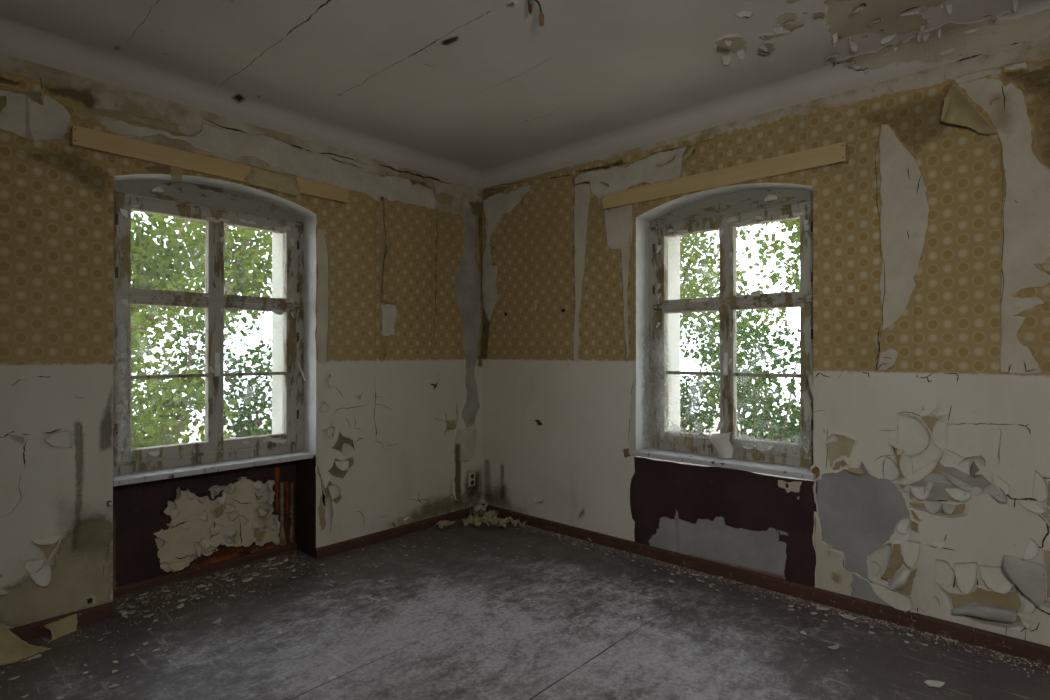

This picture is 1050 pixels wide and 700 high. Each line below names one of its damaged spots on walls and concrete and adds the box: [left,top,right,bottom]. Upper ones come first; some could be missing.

crack [217,0,331,89]
crack [340,11,490,95]
peeling [714,0,953,66]
peeling [0,73,435,210]
peeling [574,146,689,201]
crack [335,377,395,446]
peeling [0,519,113,628]
peeling [151,474,281,574]
peeling [777,402,1031,622]
peeling [934,470,1050,639]